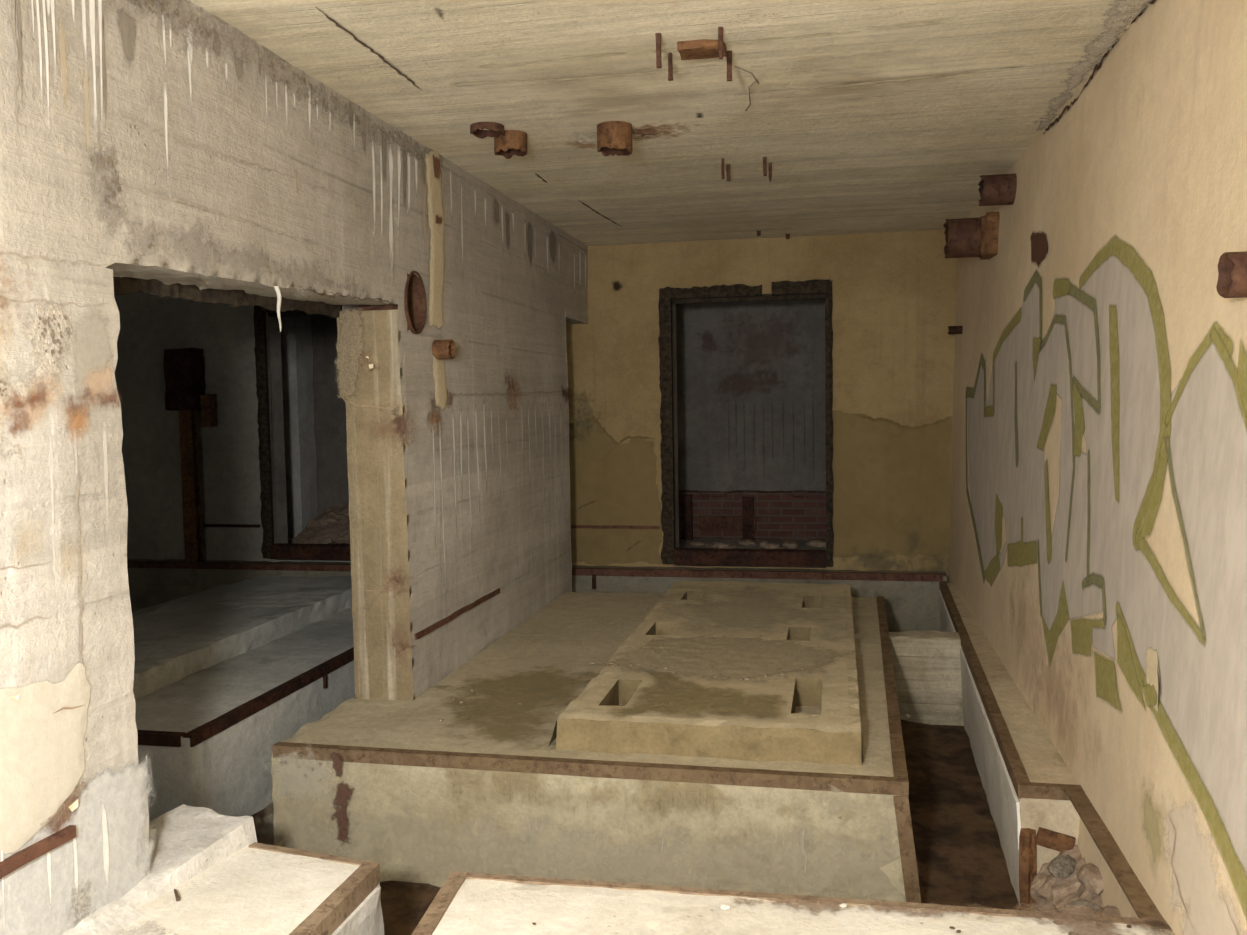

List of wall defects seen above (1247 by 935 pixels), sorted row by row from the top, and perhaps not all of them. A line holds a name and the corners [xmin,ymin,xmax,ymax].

water stain [16,0,56,114]
water stain [71,0,107,120]
water stain [118,9,136,61]
water stain [187,25,243,104]
crack [316,7,423,91]
water stain [349,104,425,260]
water stain [440,169,586,293]
rust [7,382,53,433]
rust [68,369,118,432]
peeling [0,663,153,935]
rust [331,752,353,843]
peeling [1166,805,1240,935]